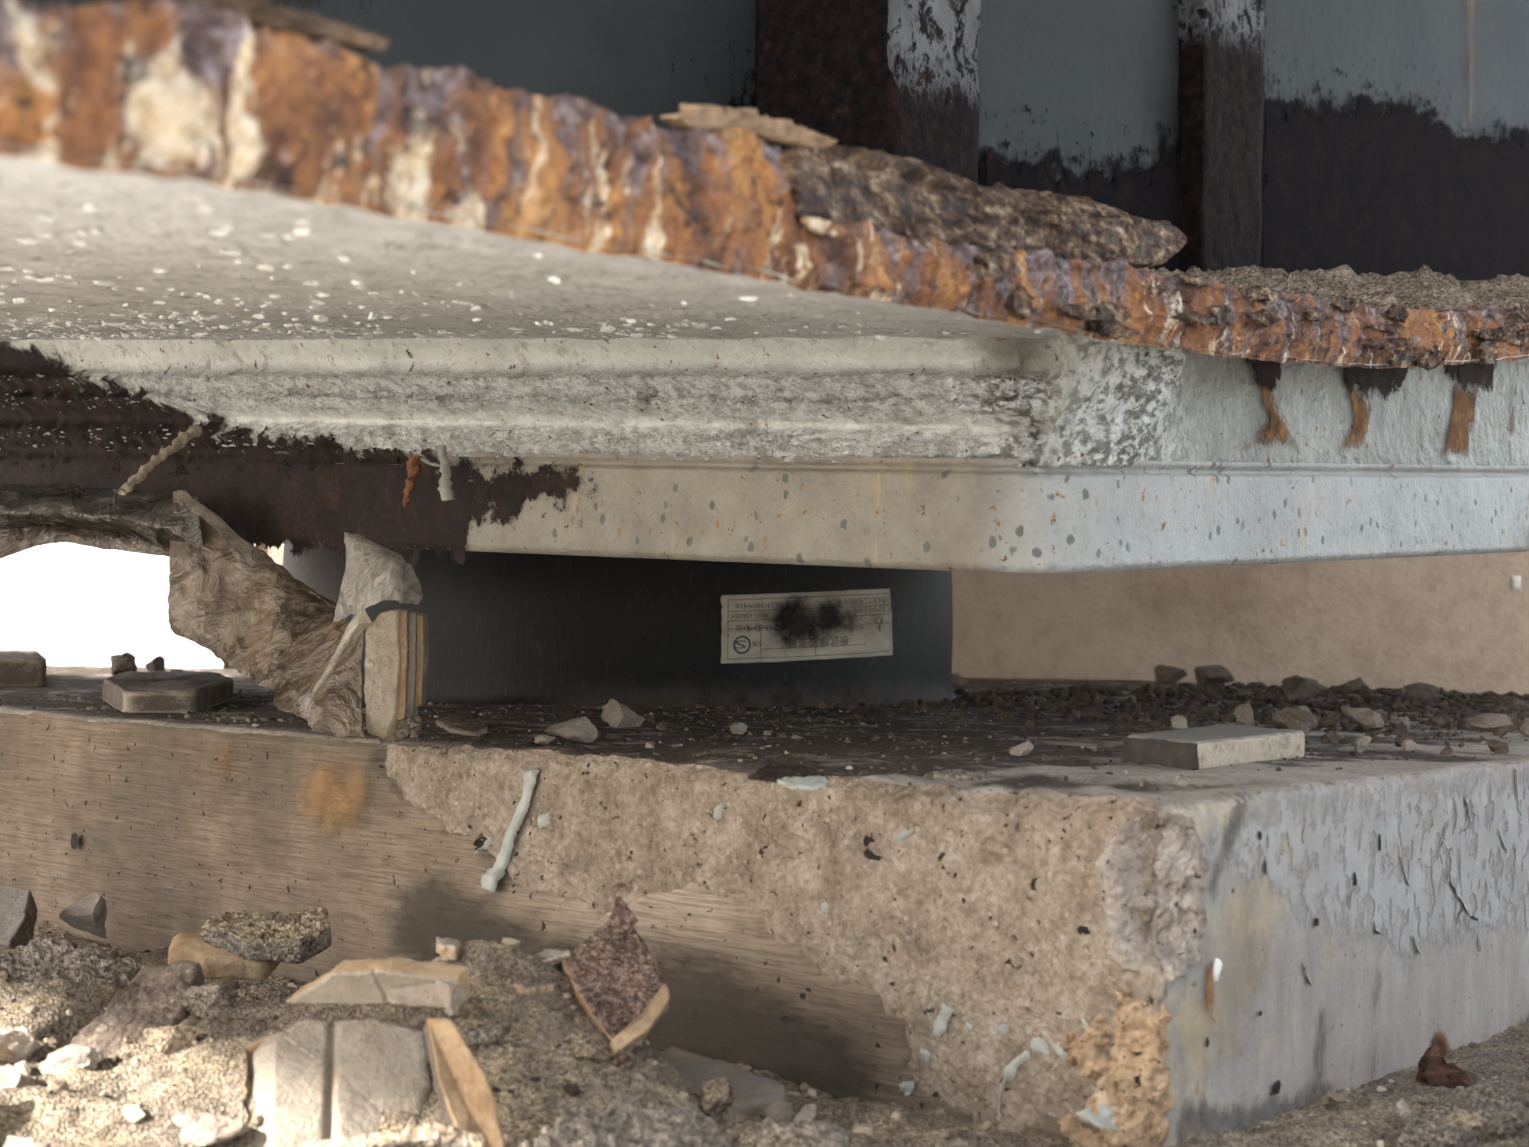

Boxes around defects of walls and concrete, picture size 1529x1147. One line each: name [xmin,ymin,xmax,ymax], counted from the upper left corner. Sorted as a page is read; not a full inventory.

corrosion [178,0,389,51]
corrosion [651,17,1187,271]
corrosion [1260,17,1529,281]
corrosion [1244,358,1299,452]
corrosion [1343,366,1420,449]
corrosion [1443,361,1497,458]
spalling [385,740,1529,1147]